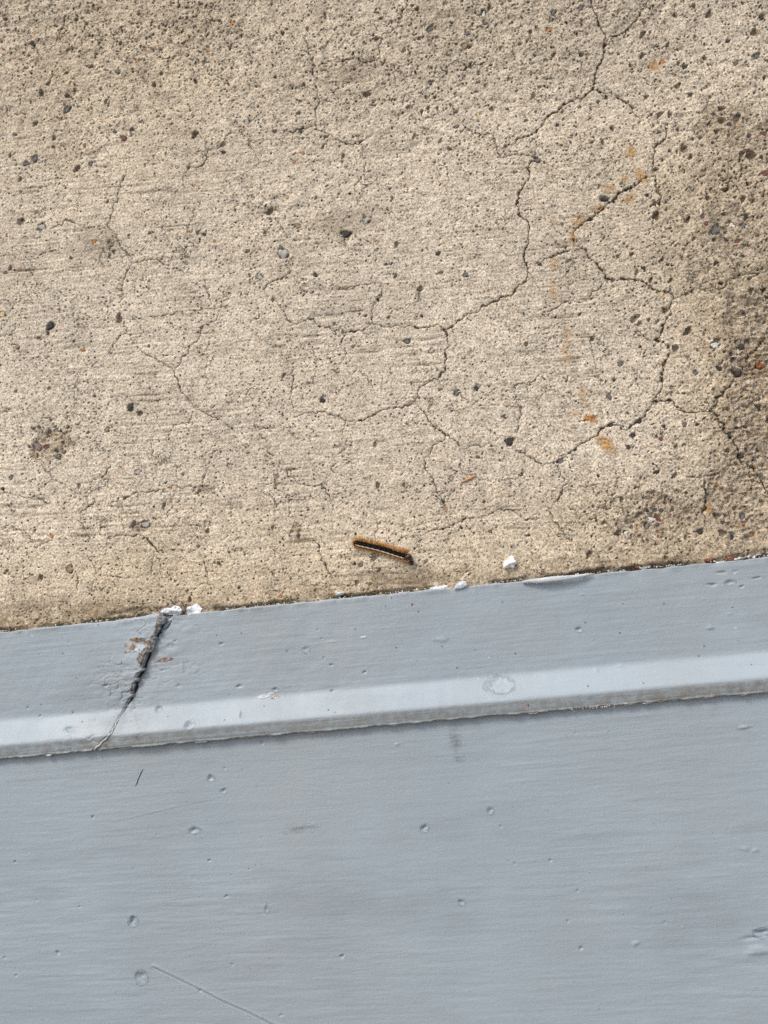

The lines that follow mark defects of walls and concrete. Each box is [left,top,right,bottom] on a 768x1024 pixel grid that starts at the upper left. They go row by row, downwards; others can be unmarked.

crack [41,173,233,461]
crack [261,0,768,541]
crack [4,467,207,588]
peeling [123,612,173,666]
crack [129,615,170,703]